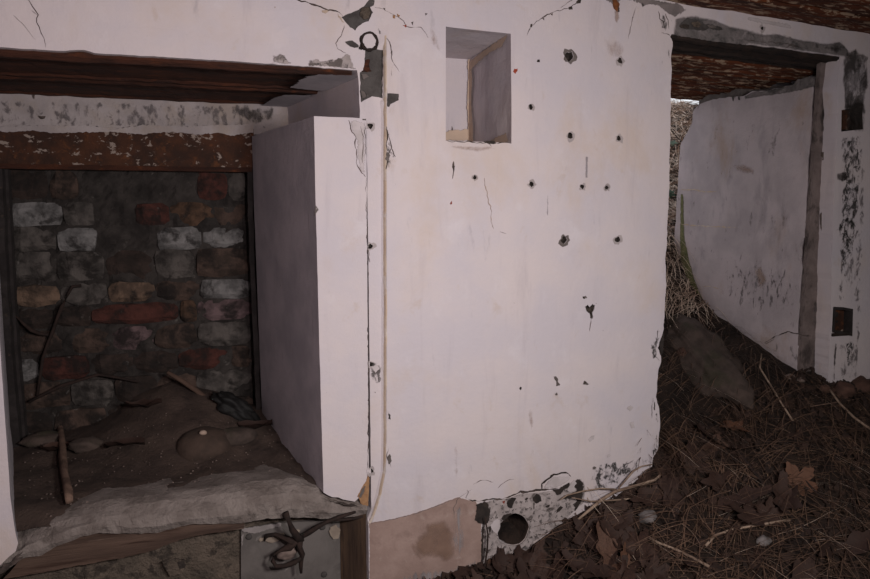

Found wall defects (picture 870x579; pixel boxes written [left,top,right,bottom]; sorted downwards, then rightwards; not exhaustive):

crack [298,0,343,22]
crack [528,0,581,32]
leakage [831,47,868,267]
flaking render [309,0,398,524]
crack [0,552,23,574]
leakage [369,489,482,579]
peeling [475,477,585,564]